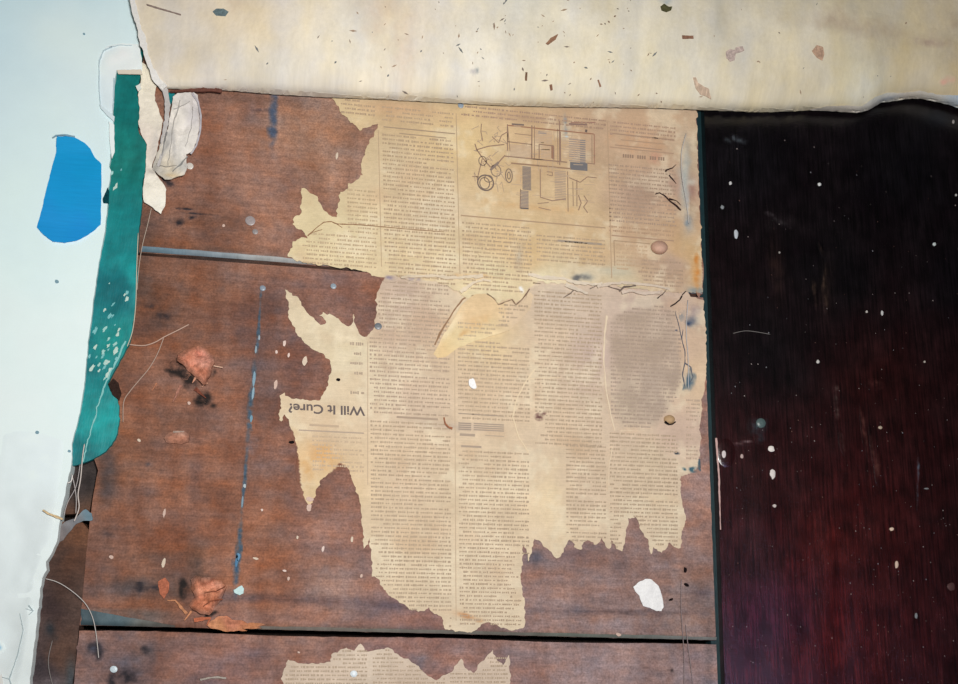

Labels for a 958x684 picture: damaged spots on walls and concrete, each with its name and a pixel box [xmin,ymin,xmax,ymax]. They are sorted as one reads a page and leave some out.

crack [655,166,681,211]
crack [434,282,541,345]
peeling [633,579,664,611]